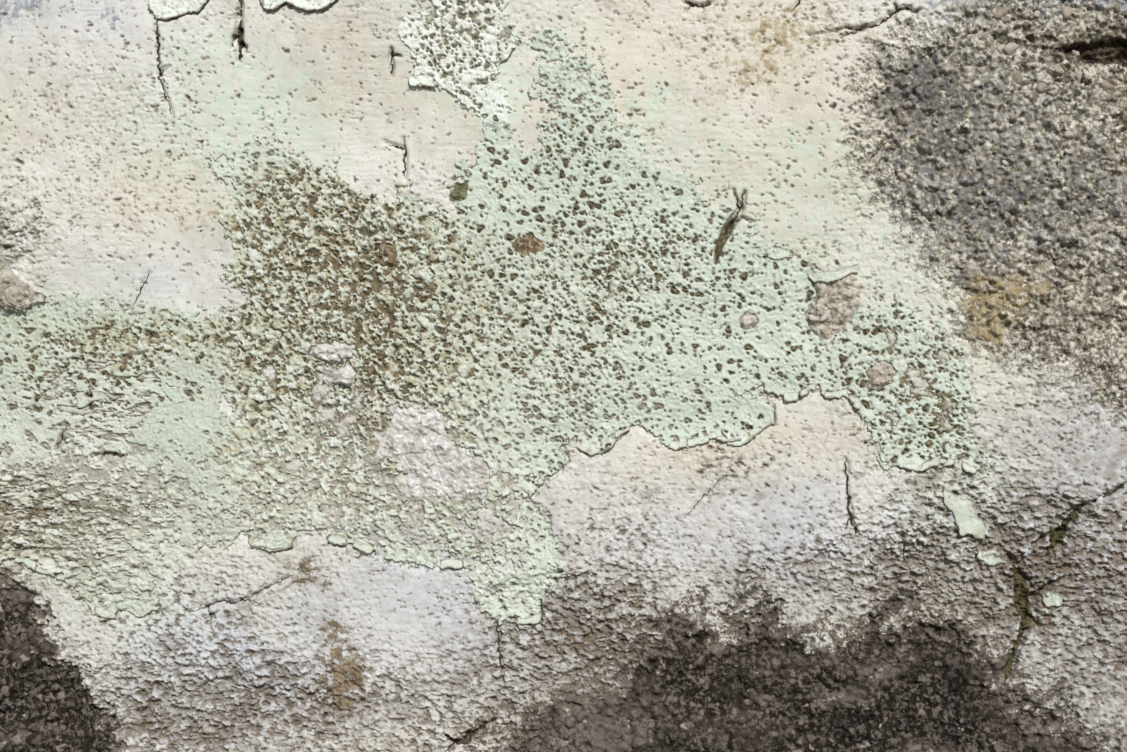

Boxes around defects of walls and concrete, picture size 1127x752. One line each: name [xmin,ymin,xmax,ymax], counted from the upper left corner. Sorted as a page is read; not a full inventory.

crack [155,26,173,115]
crack [232,0,247,59]
crack [715,191,750,264]
peeling [203,0,1127,633]
peeling [0,290,248,621]
crack [1034,484,1124,551]
flaking render [0,568,130,752]
damp [734,581,808,644]
flaking render [457,564,1127,752]
damp [873,587,918,615]
crack [1004,555,1063,685]
damp [1035,723,1127,752]